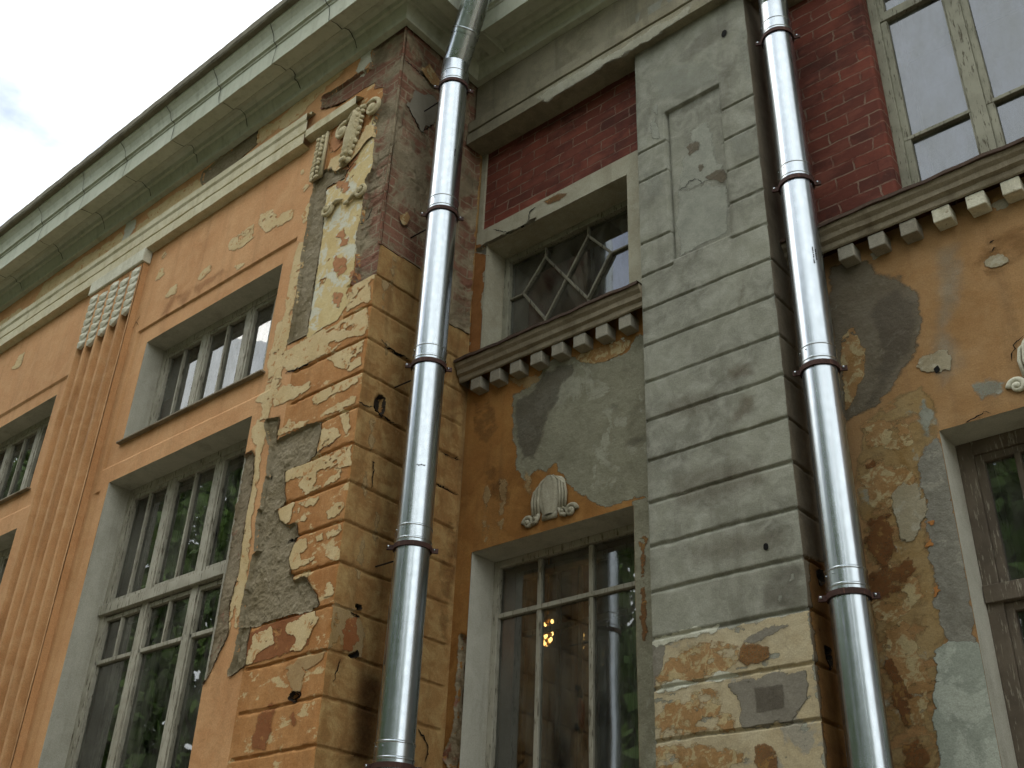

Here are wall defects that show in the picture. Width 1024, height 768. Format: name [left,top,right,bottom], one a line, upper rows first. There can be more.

flaking render [449,81,535,352]
flaking render [32,26,444,685]
peeling [575,337,630,364]
peeling [840,327,866,410]
peeling [916,350,952,372]
peeling [638,536,848,768]
peeling [856,387,945,768]